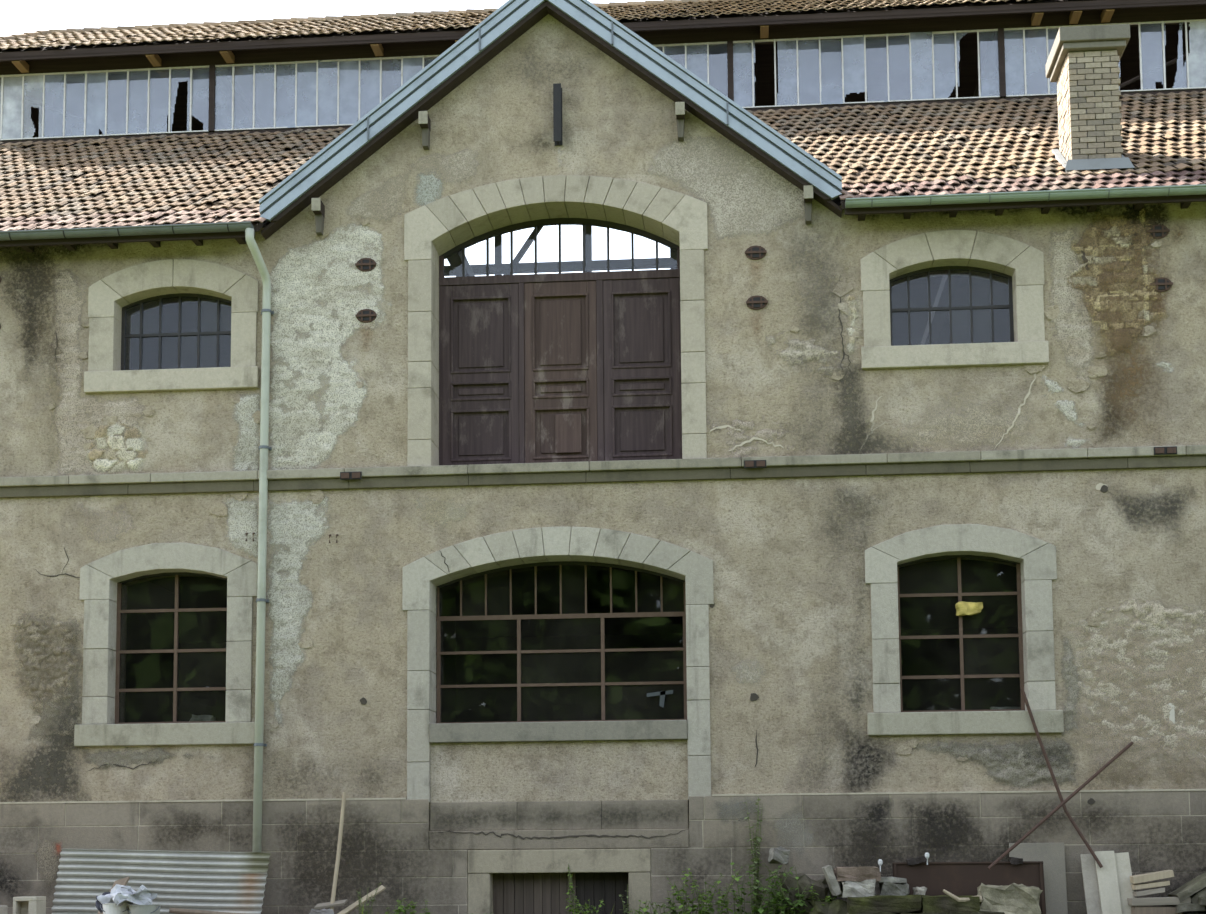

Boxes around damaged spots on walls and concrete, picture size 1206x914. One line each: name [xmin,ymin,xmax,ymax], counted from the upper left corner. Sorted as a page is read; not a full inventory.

damp [0,243,106,347]
peeling [48,270,155,475]
peeling [229,220,391,471]
crack [709,425,784,451]
crack [838,277,852,383]
crack [994,373,1036,450]
flaking render [1024,207,1167,448]
damp [1122,497,1182,523]
crack [35,548,80,578]
peeling [209,490,329,728]
damp [2,702,79,801]
crack [427,829,688,840]